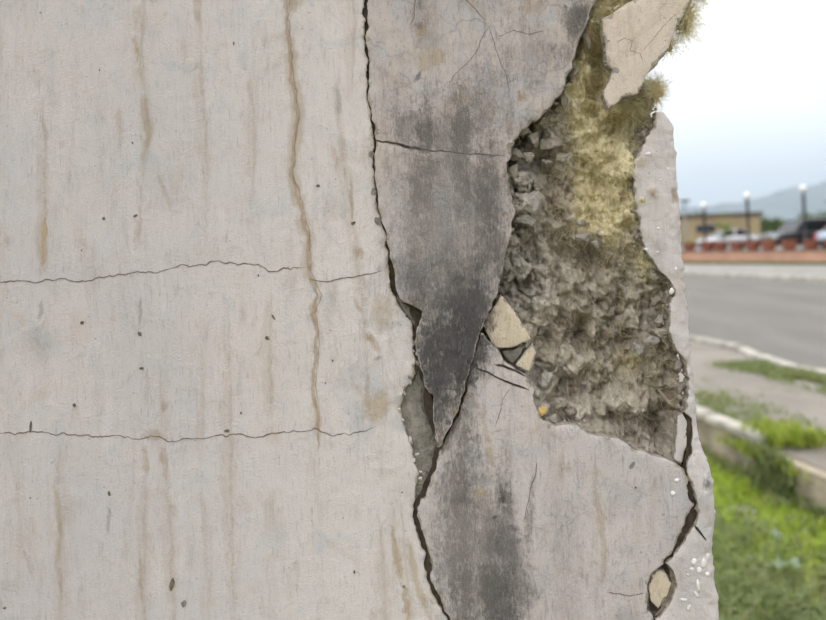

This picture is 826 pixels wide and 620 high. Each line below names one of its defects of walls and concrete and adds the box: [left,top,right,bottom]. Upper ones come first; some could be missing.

crack [0,0,541,620]
leakage [407,230,504,442]
spalling [483,0,735,468]
crack [608,412,706,620]